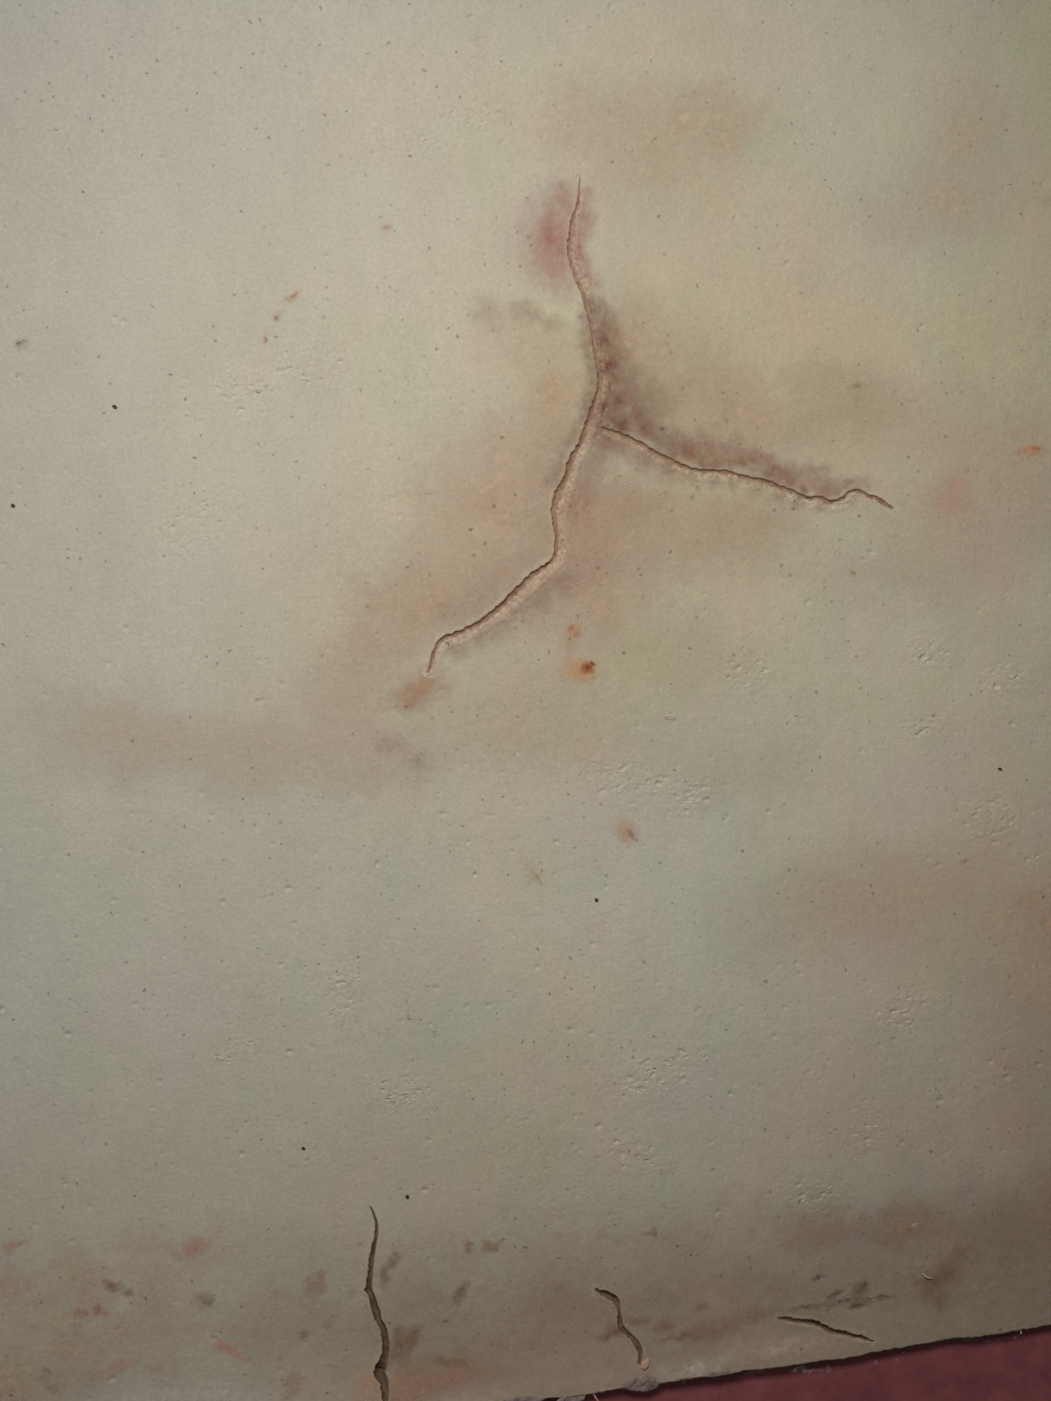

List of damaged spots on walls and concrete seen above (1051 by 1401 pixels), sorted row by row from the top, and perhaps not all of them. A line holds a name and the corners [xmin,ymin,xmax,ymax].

crack [425,171,896,676]
water stain [569,301,852,570]
corrosion [571,660,595,679]
crack [359,1203,394,1401]
crack [593,1285,648,1370]
water stain [663,1356,726,1381]
crack [776,1312,875,1346]